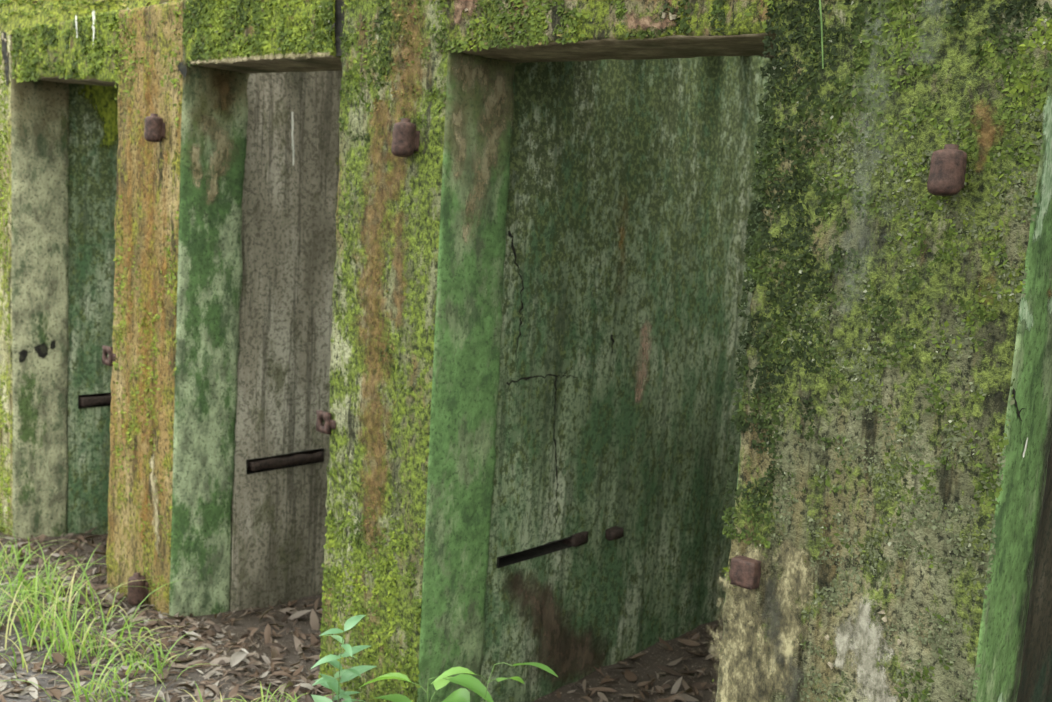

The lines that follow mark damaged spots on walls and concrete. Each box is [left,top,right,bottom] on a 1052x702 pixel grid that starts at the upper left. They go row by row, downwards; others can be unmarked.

crack [506,231,581,523]